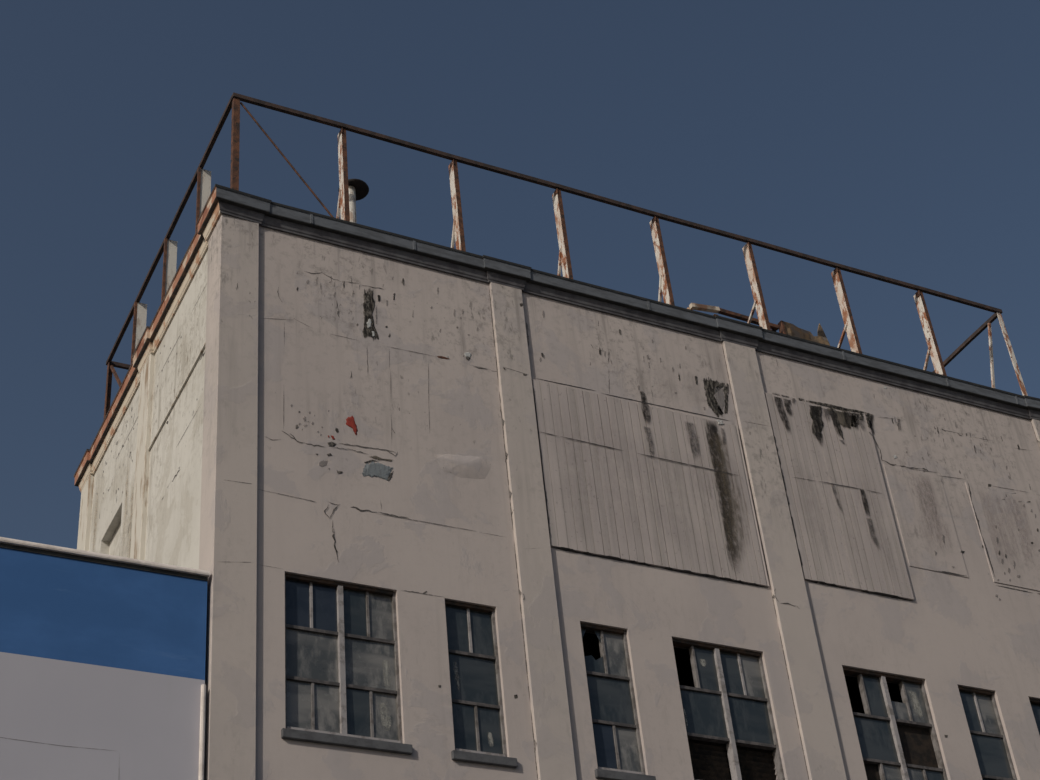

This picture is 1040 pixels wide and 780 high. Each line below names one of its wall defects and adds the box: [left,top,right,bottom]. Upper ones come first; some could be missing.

spalling [357,289,391,341]
peeling [315,416,358,456]
water stain [640,392,654,454]
spalling [695,376,729,425]
water stain [774,394,878,445]
peeling [362,456,394,481]
water stain [687,423,742,553]
crack [305,499,410,562]